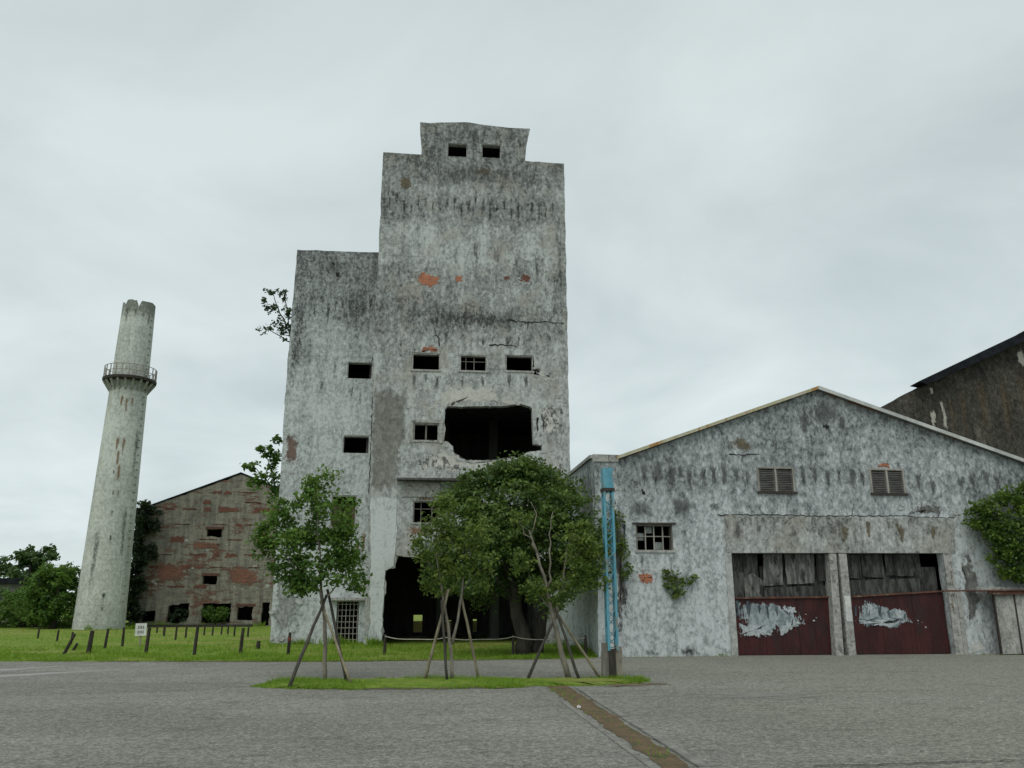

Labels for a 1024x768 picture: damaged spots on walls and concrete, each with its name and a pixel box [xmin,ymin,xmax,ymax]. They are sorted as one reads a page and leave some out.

leakage [384,178,553,219]
crack [489,316,563,346]
spalling [419,378,526,416]
spalling [281,423,303,474]
leakage [372,391,404,488]
spalling [395,395,567,478]
leakage [641,467,749,488]
leakage [801,468,864,485]
spalling [147,490,303,641]
spalling [614,486,653,646]
peeling [736,600,817,638]
peeling [854,601,927,628]